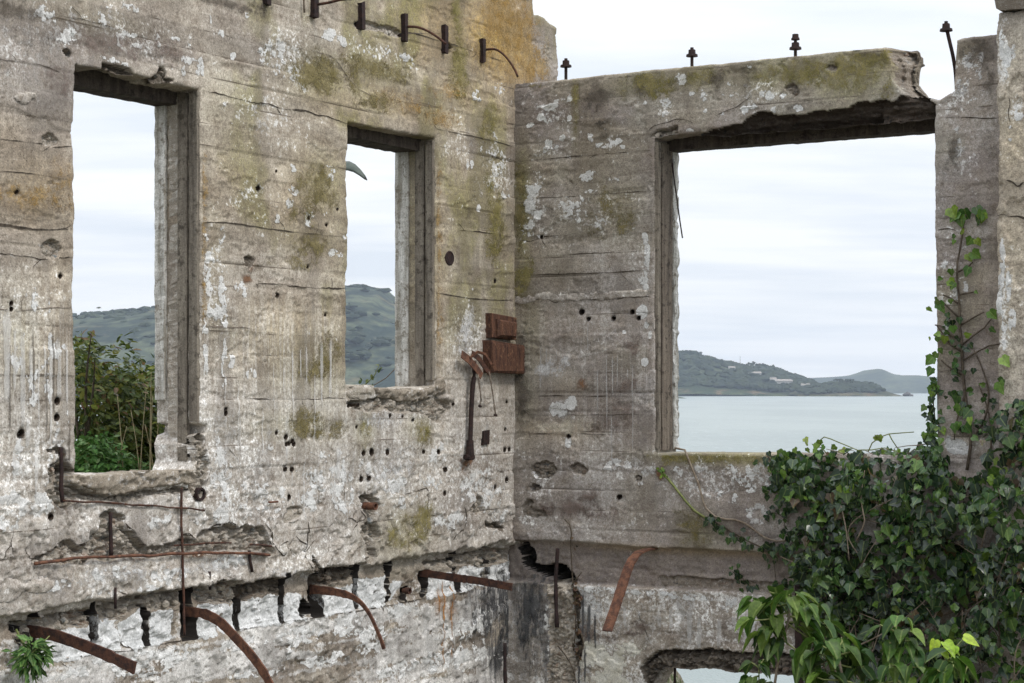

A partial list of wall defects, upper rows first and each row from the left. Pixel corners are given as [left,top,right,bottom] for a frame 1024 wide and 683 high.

leakage [286,0,549,128]
spalling [652,51,936,138]
leakage [742,50,894,99]
peeling [6,333,66,417]
peeling [0,410,510,683]
leakage [464,565,546,673]
spalling [544,575,794,683]